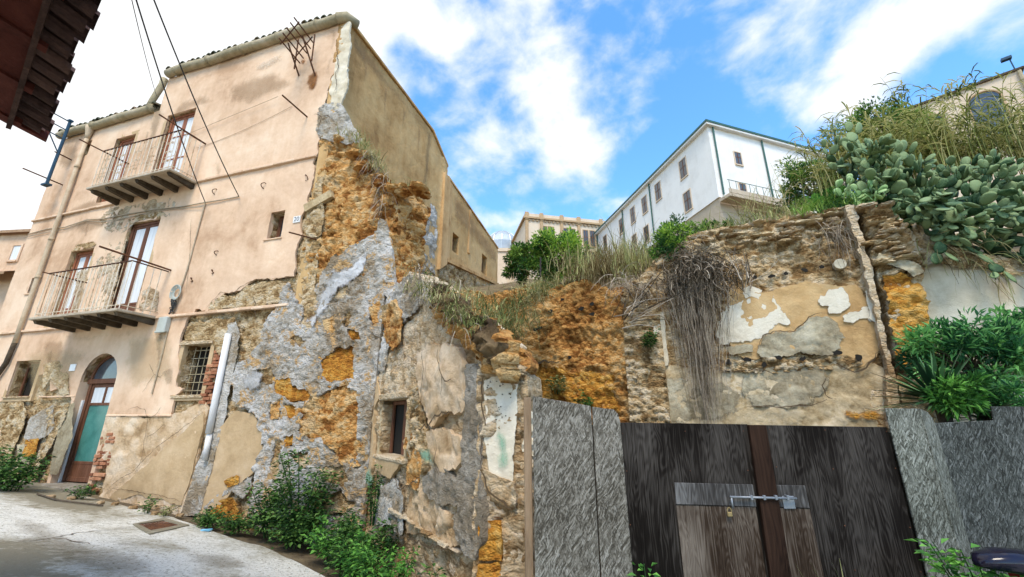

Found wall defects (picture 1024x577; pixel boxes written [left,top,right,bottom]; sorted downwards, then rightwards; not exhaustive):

spalling [0,361,69,481]
flaking render [203,176,494,548]
flaking render [476,376,518,577]
flaking render [667,265,880,423]
spalling [882,272,931,374]